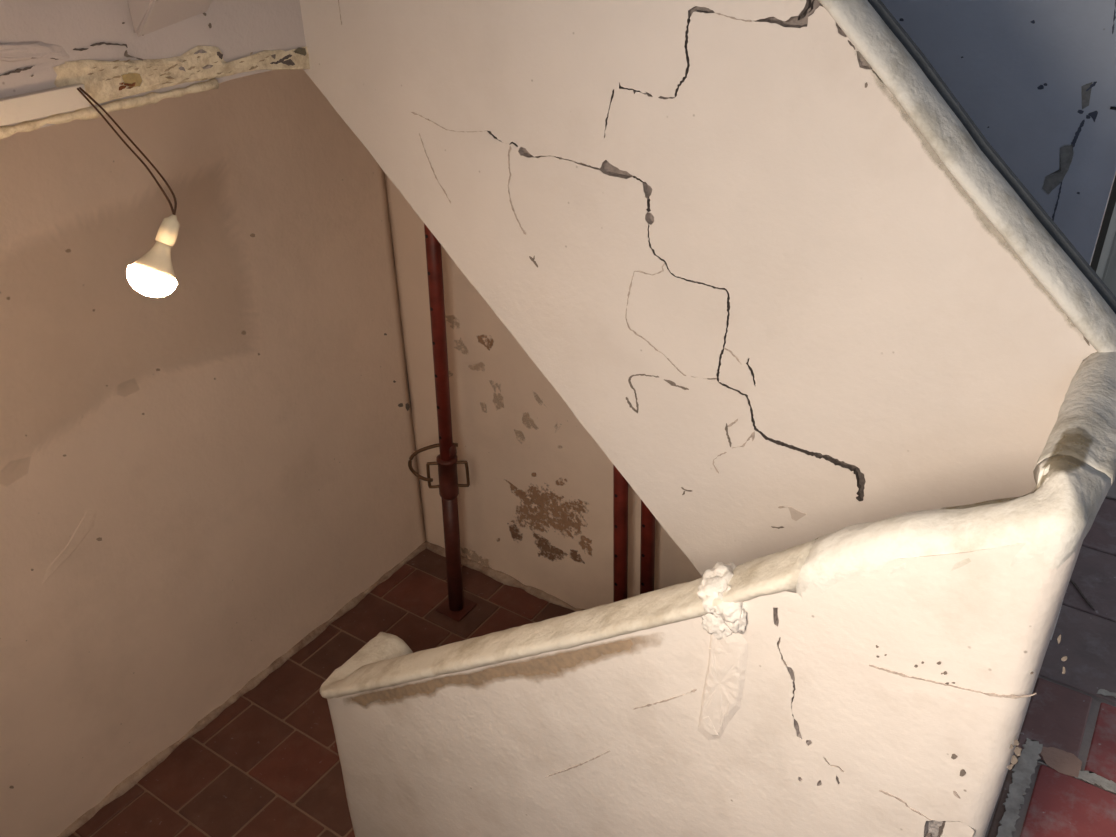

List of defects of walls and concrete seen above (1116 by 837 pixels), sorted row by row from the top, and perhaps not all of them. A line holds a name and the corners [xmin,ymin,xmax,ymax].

crack [0,66,33,76]
crack [73,42,144,61]
flaking render [0,41,310,139]
peeling [1078,81,1098,122]
crack [1071,120,1085,150]
peeling [1042,145,1073,194]
crack [1052,182,1062,221]
crack [411,0,866,501]
crack [869,645,1037,699]
crack [773,607,843,786]
flaking render [924,820,975,837]